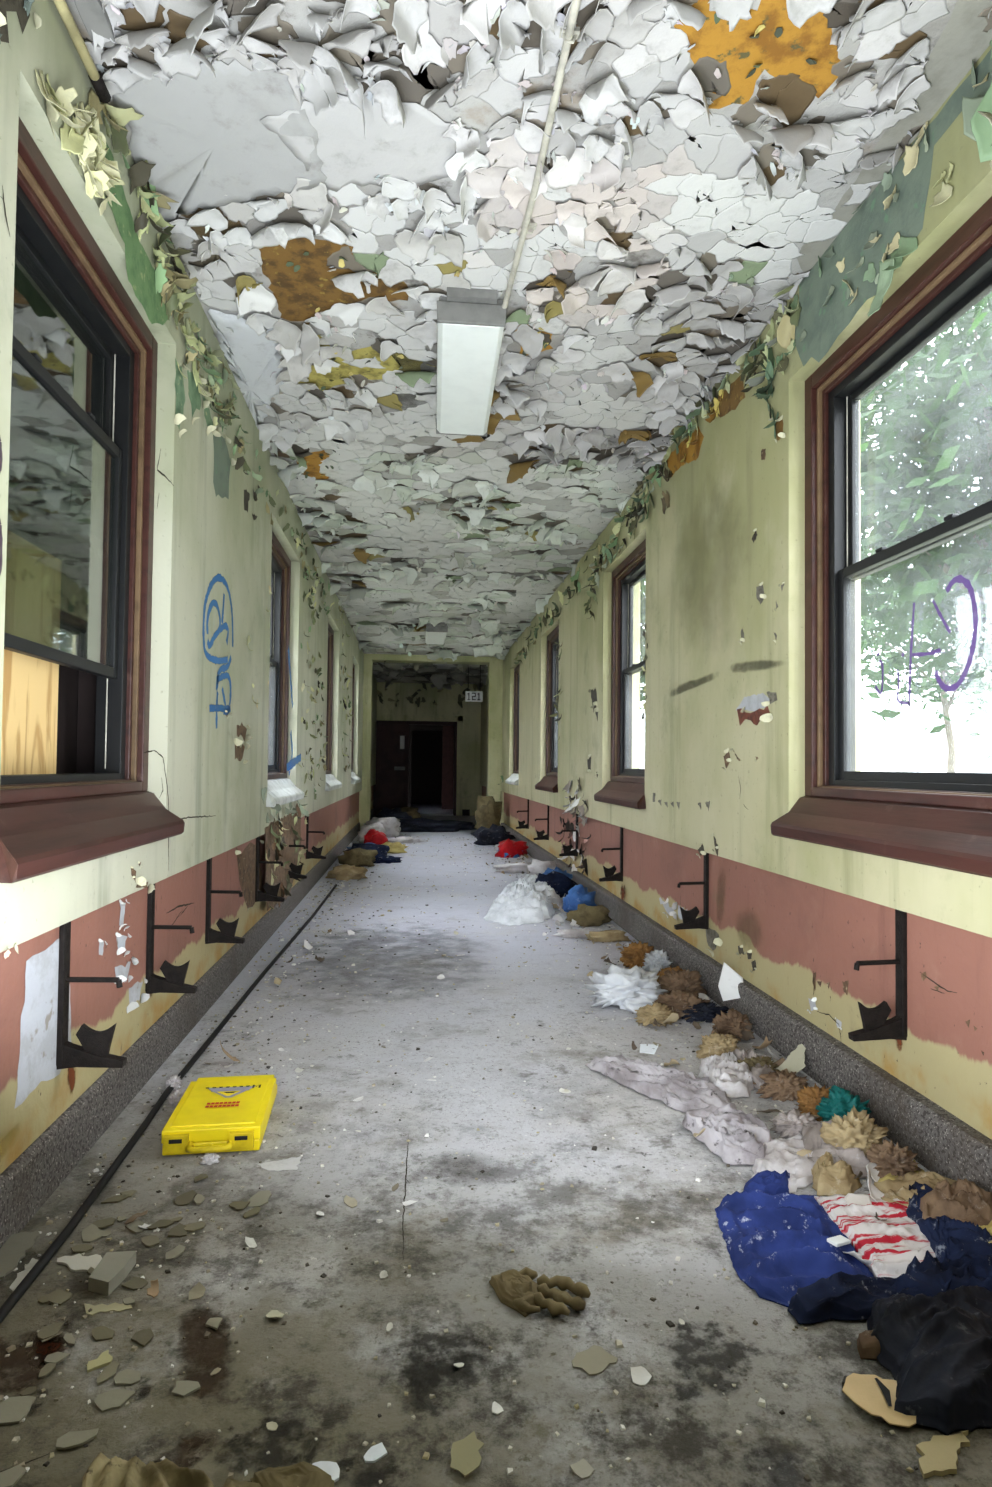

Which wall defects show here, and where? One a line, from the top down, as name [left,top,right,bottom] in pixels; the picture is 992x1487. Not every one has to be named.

spalling [0,0,42,44]
peeling [35,0,992,912]
spalling [659,897,687,920]
spalling [98,861,155,1013]
spalling [701,927,757,972]
spalling [807,972,849,1014]